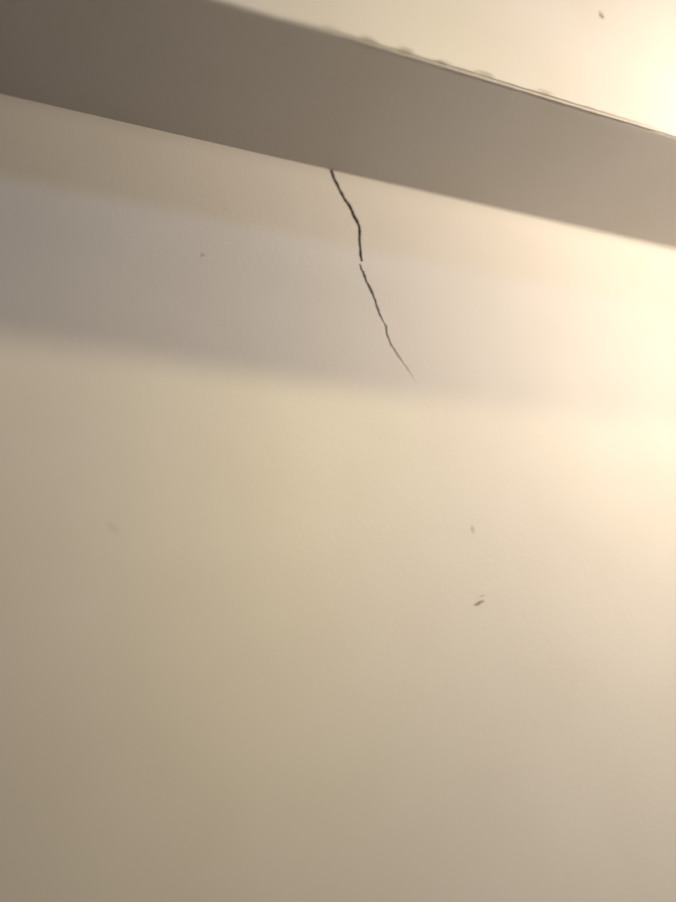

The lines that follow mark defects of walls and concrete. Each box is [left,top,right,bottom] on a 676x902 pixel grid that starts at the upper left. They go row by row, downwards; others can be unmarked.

crack [330,170,381,317]